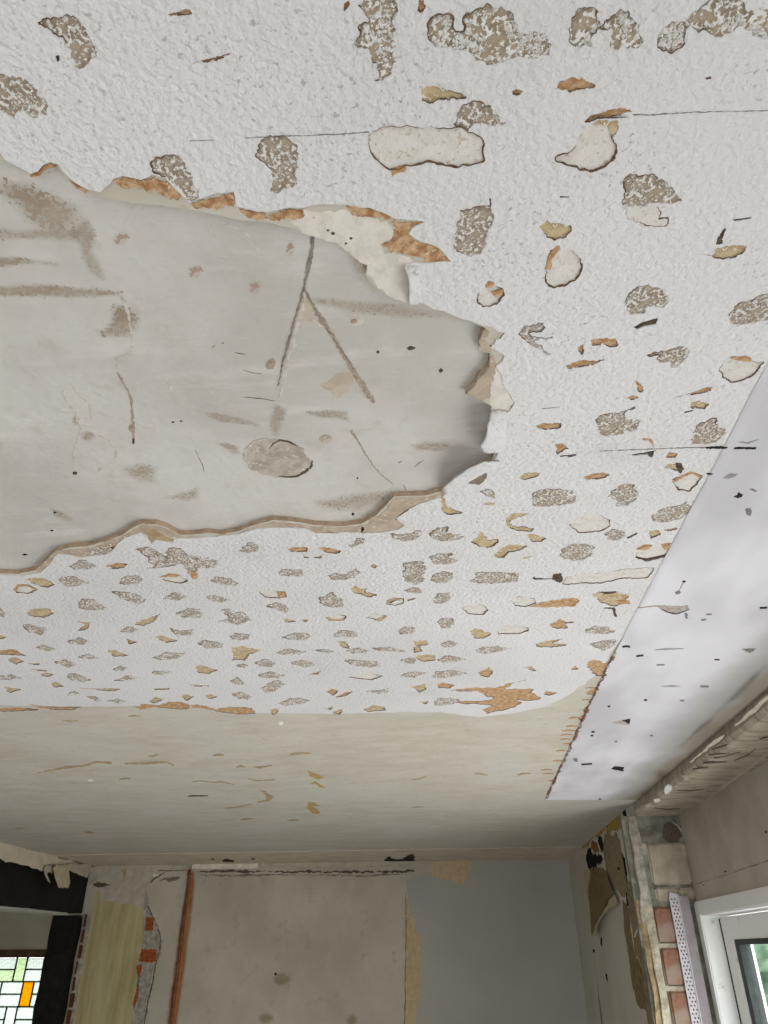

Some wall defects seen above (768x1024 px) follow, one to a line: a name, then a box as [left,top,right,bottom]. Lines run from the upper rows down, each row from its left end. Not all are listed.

crack [247,130,369,138]
crack [598,110,768,119]
peeling [290,209,415,302]
crack [277,236,375,403]
peeling [477,281,505,307]
spalling [243,438,313,478]
peeling [471,513,546,559]
peeling [562,528,676,606]
peeling [513,596,580,648]
peeling [128,665,255,717]
peeling [411,666,555,714]
spalling [0,842,163,1024]